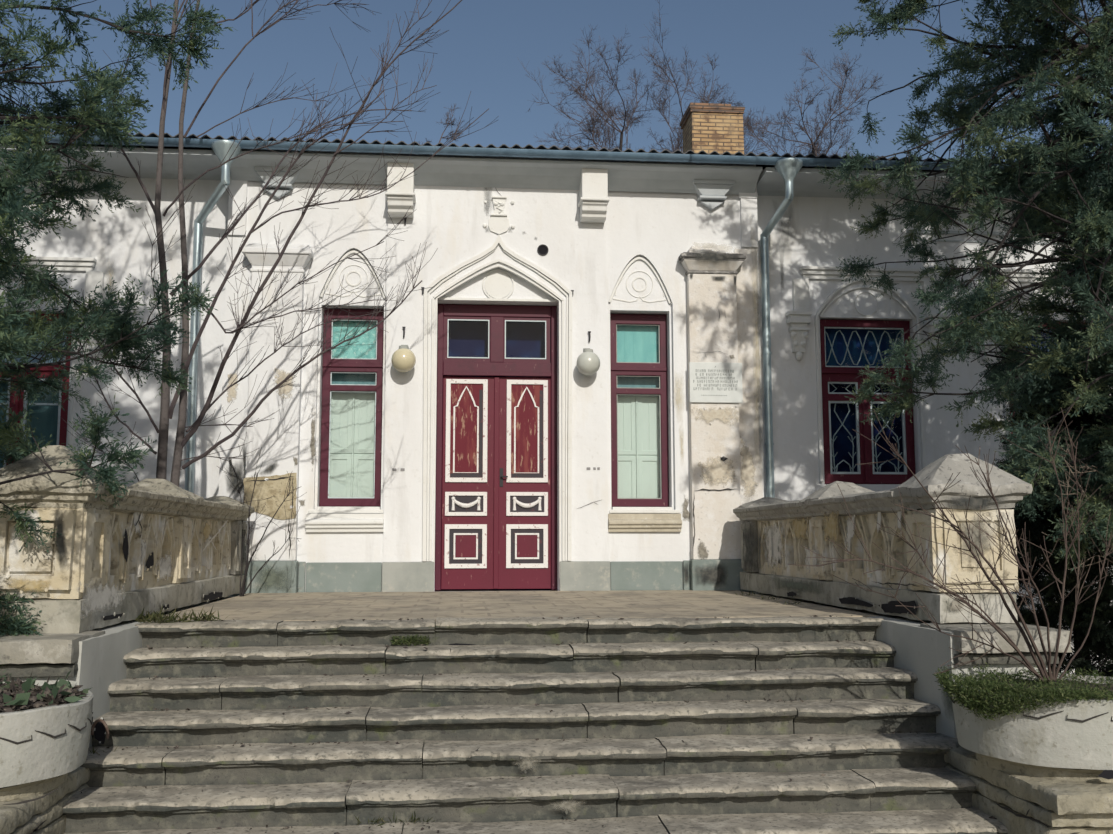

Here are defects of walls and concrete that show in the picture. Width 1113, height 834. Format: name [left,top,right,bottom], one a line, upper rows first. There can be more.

flaking render [243,457,304,520]
flaking render [309,407,317,464]
peeling [698,435,758,496]
spalling [838,597,917,616]